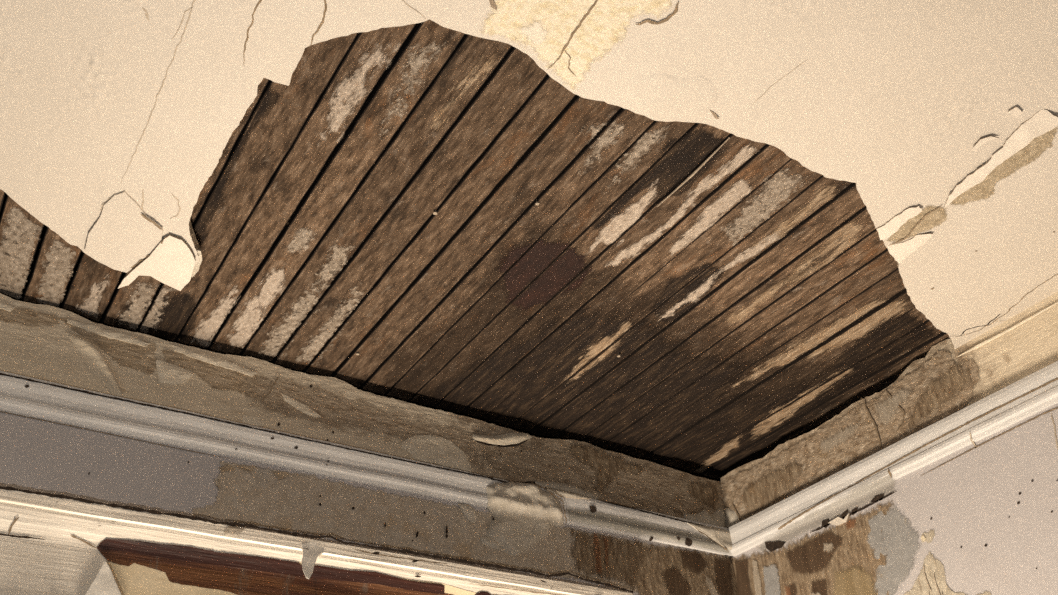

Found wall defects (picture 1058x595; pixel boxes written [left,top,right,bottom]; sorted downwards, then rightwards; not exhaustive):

crack [121,0,196,182]
crack [243,0,262,64]
crack [309,0,327,47]
crack [548,0,598,75]
peeling [635,2,679,25]
flaking render [84,189,203,291]
flaking render [876,106,1058,262]
damp [115,244,364,365]
damp [423,122,934,514]
flaking render [0,302,1058,552]
flaking render [86,461,667,595]
flaking render [810,491,991,595]